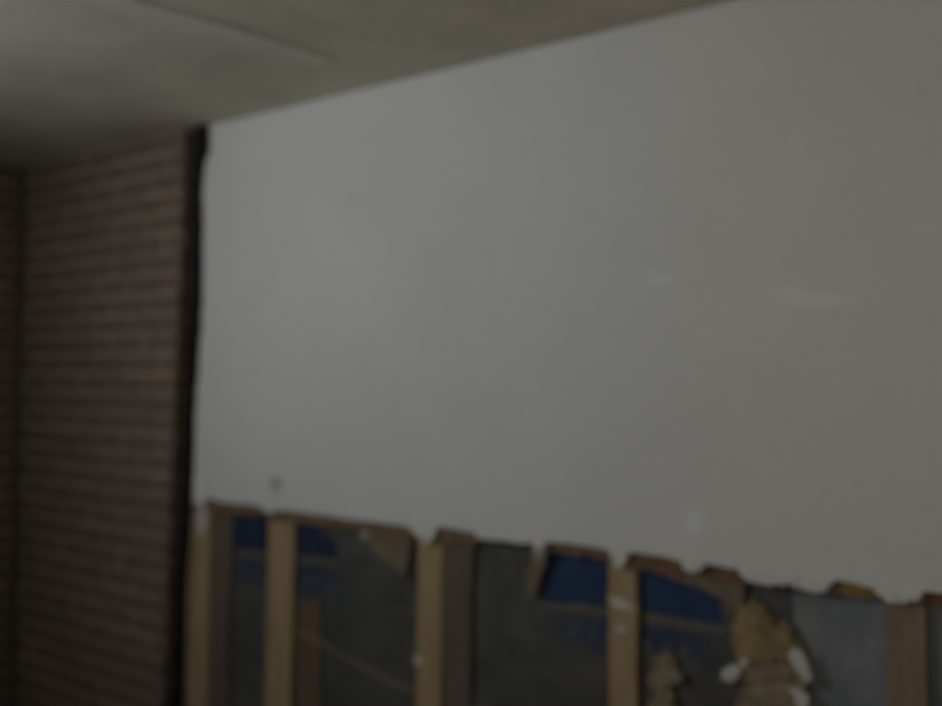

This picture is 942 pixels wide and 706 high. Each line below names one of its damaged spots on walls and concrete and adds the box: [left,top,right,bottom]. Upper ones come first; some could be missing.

peeling [193,452,478,549]
peeling [530,535,942,606]
peeling [721,603,813,706]